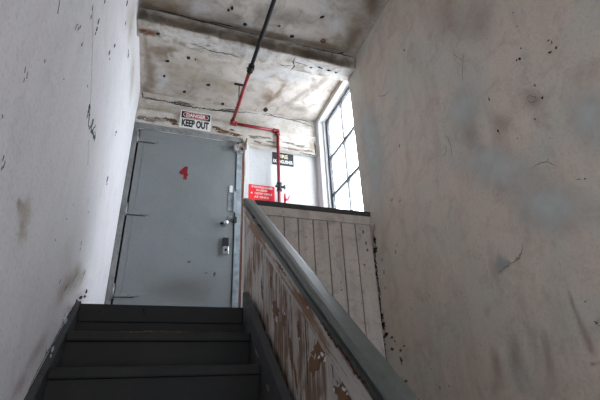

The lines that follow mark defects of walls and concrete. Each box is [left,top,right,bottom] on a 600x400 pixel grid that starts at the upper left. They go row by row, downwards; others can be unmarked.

water stain [138,0,365,123]
crack [142,93,312,127]
peeling [212,126,276,144]
peeling [264,290,298,395]
peeling [308,339,327,377]
peeling [318,318,376,400]